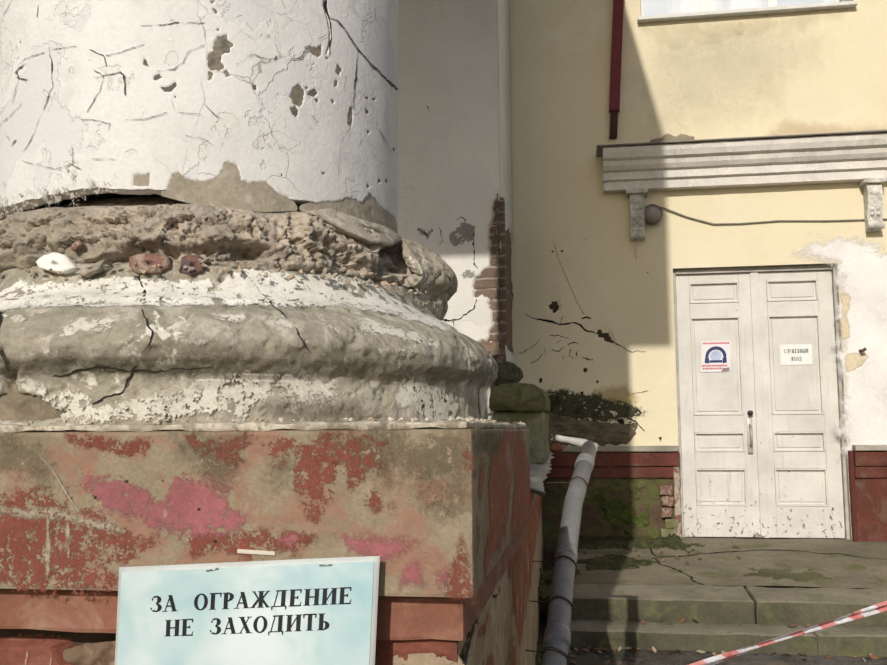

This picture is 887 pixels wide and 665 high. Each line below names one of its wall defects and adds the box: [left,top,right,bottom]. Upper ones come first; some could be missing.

crack [0,22,219,169]
crack [237,0,398,103]
crack [52,275,212,410]
spalling [0,162,453,358]
crack [242,272,309,351]
peeling [439,222,475,247]
crack [443,299,477,325]
spalling [462,193,514,363]
crack [520,241,645,363]
peeling [0,367,346,457]
peeling [0,427,392,604]
spalling [392,653,464,665]